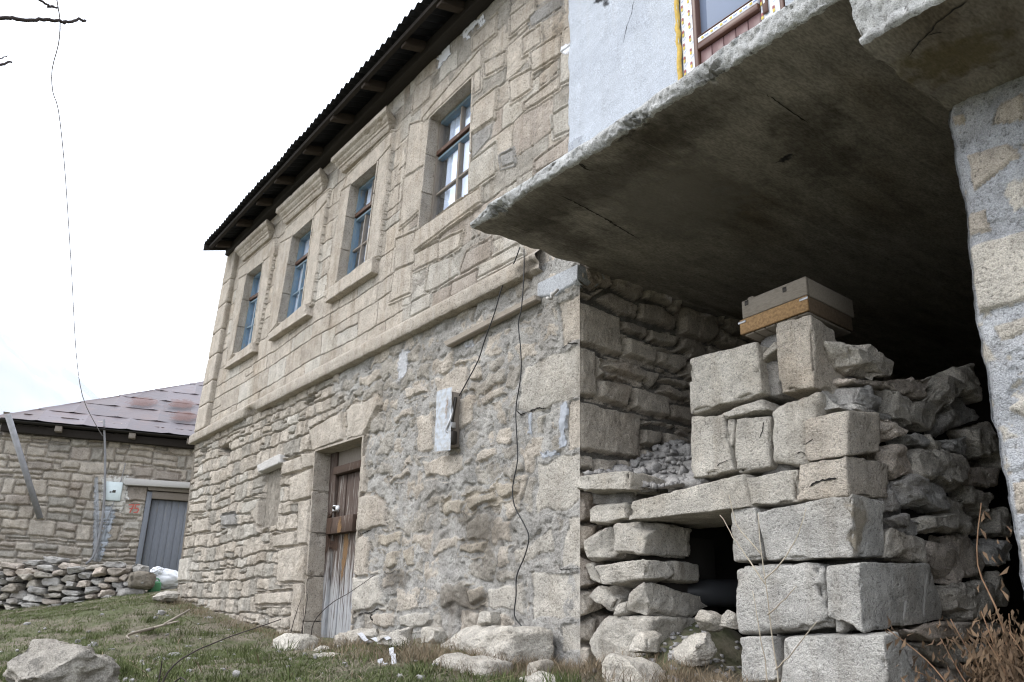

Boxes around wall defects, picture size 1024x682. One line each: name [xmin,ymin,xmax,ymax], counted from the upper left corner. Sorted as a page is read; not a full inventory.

crack [909,0,968,56]
crack [562,196,640,240]